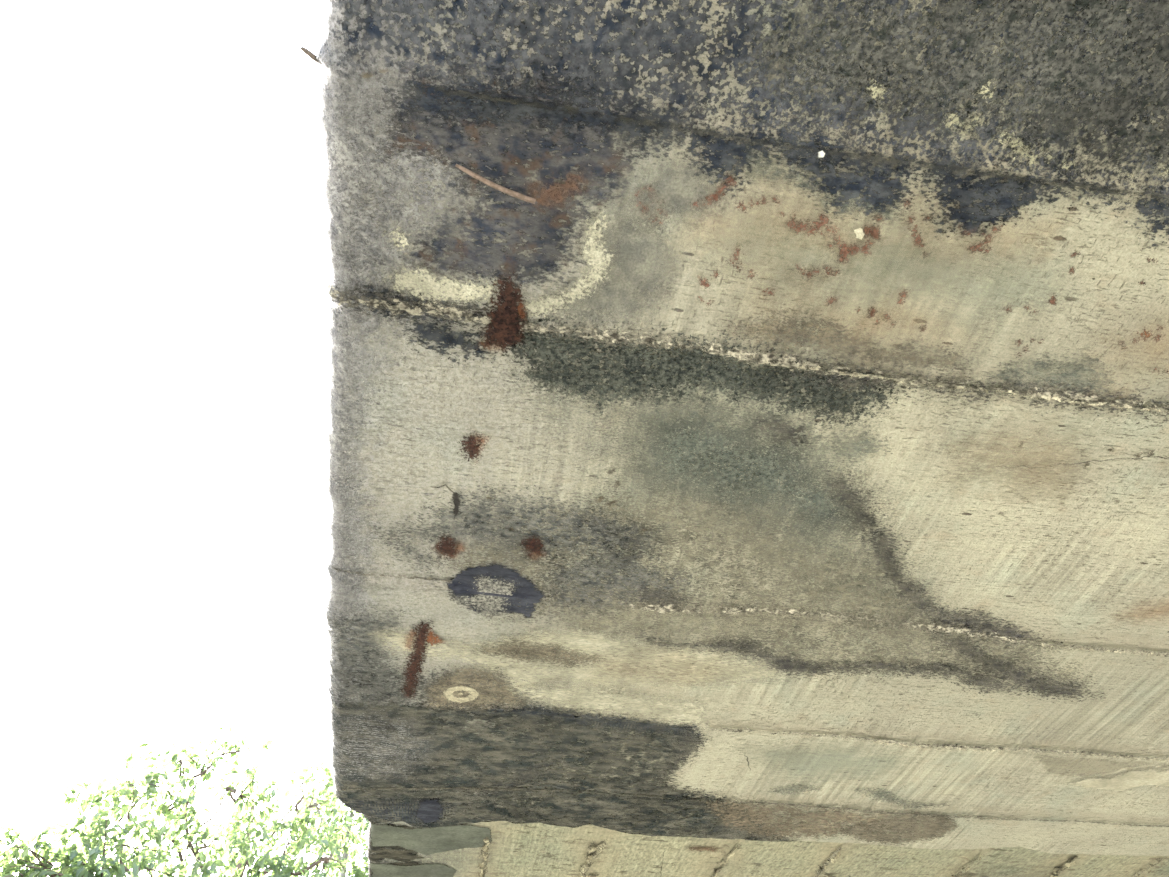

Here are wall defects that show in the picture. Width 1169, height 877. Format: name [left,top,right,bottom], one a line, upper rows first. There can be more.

rust [736,195,883,280]
rust [903,201,933,258]
rust [956,225,1003,254]
rust [698,245,754,305]
rust [474,271,532,354]
rust [857,289,911,328]
rust [1118,325,1163,349]
rust [457,431,489,461]
leakage [315,0,1169,877]
rust [434,534,465,559]
rust [517,533,549,558]
rust [401,619,443,700]